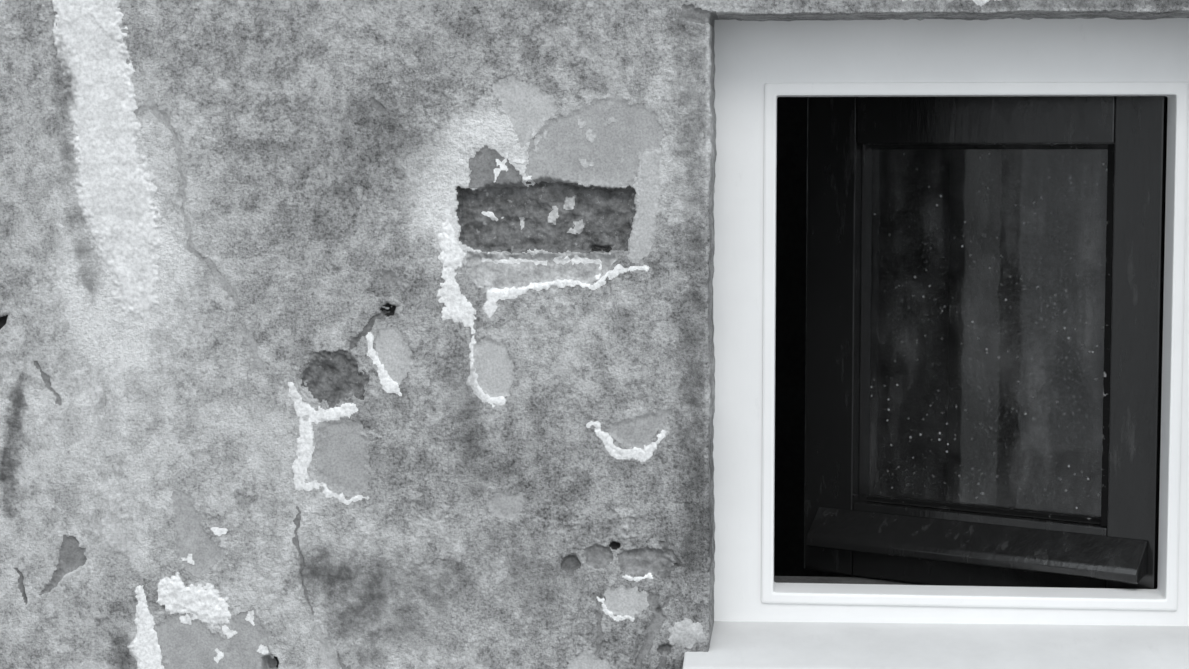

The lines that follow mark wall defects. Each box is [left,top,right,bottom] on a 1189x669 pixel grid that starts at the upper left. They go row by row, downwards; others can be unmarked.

flaking render [443,76,664,318]
crack [344,310,390,355]
spalling [466,335,514,408]
spalling [288,326,414,505]
spalling [586,410,671,462]
crack [292,506,315,615]
flaking render [561,541,673,622]
peeling [153,607,279,669]